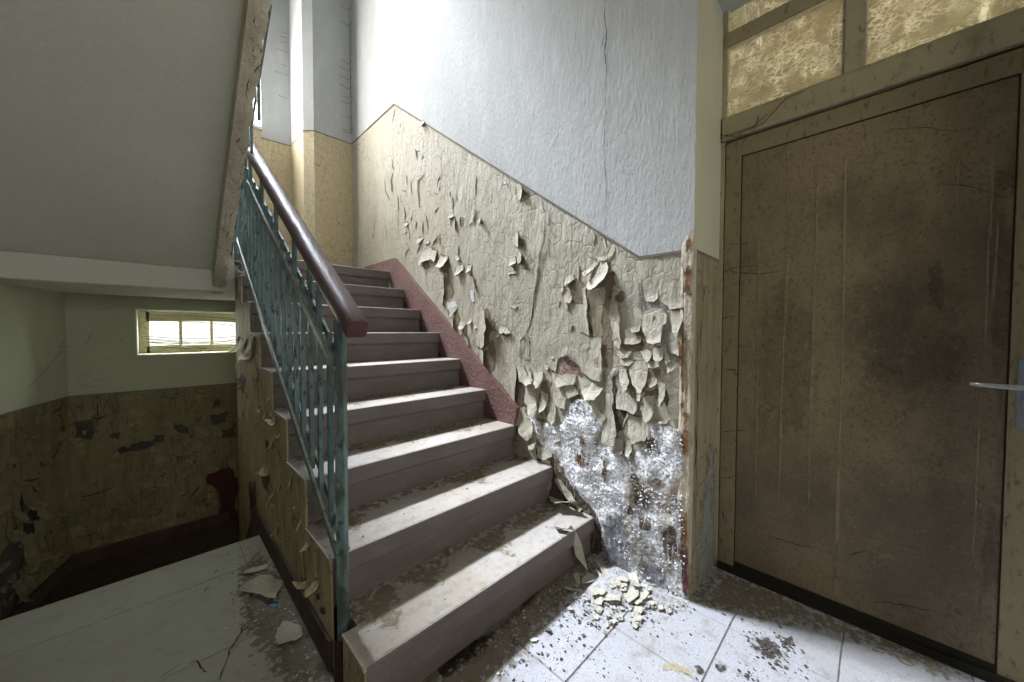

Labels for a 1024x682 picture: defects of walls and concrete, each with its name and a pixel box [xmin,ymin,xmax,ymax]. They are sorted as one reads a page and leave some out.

peeling [503,180,530,202]
peeling [384,162,512,372]
rust [684,265,692,295]
peeling [0,478,88,620]
crack [164,616,254,681]
peeling [203,316,292,520]
peeling [292,540,326,615]
peeling [508,228,697,628]
water stain [527,399,686,598]